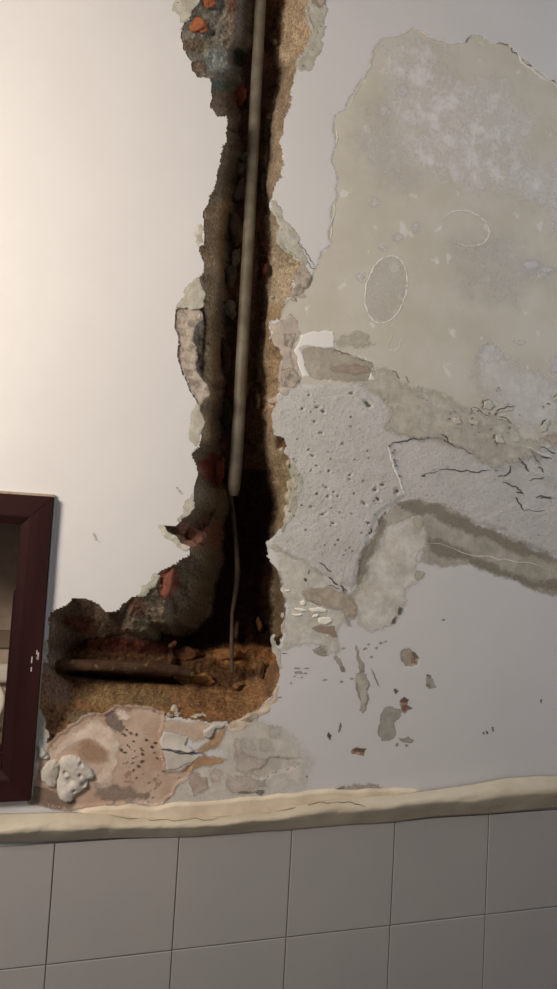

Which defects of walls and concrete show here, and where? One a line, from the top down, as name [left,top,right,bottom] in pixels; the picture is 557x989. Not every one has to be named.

peeling [28,0,557,811]
crack [329,348,429,401]
crack [391,435,556,512]
leakage [162,722,307,804]